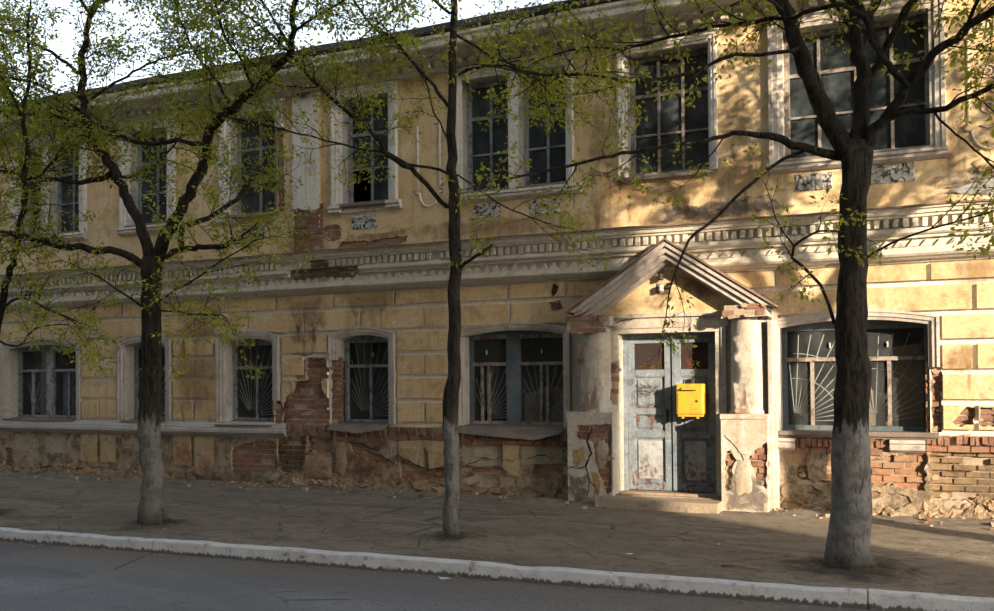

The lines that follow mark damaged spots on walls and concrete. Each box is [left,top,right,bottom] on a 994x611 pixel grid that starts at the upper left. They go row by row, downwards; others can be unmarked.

flaking render [274,129,408,252]
flaking render [551,285,606,366]
flaking render [272,352,344,473]
crack [347,442,442,471]
crack [468,427,598,496]
flaking render [797,460,831,483]
flaking render [870,362,994,501]